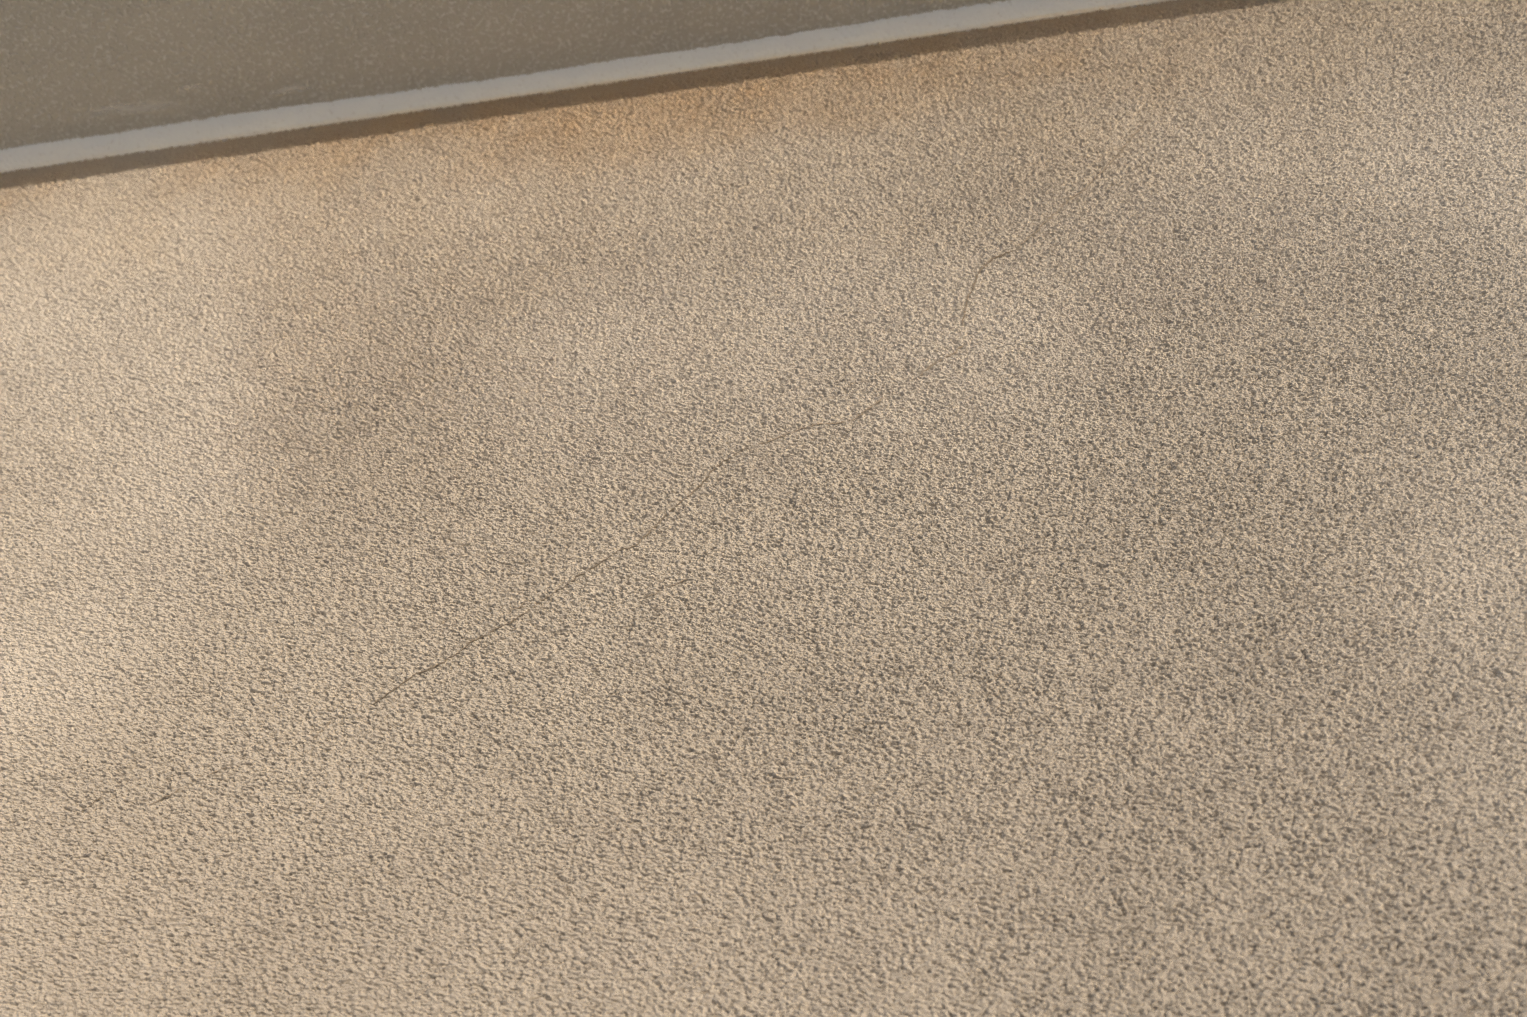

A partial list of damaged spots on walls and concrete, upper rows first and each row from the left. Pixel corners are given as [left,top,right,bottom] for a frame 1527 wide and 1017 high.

crack [919,121,1148,377]
crack [369,397,883,707]
crack [150,767,227,806]